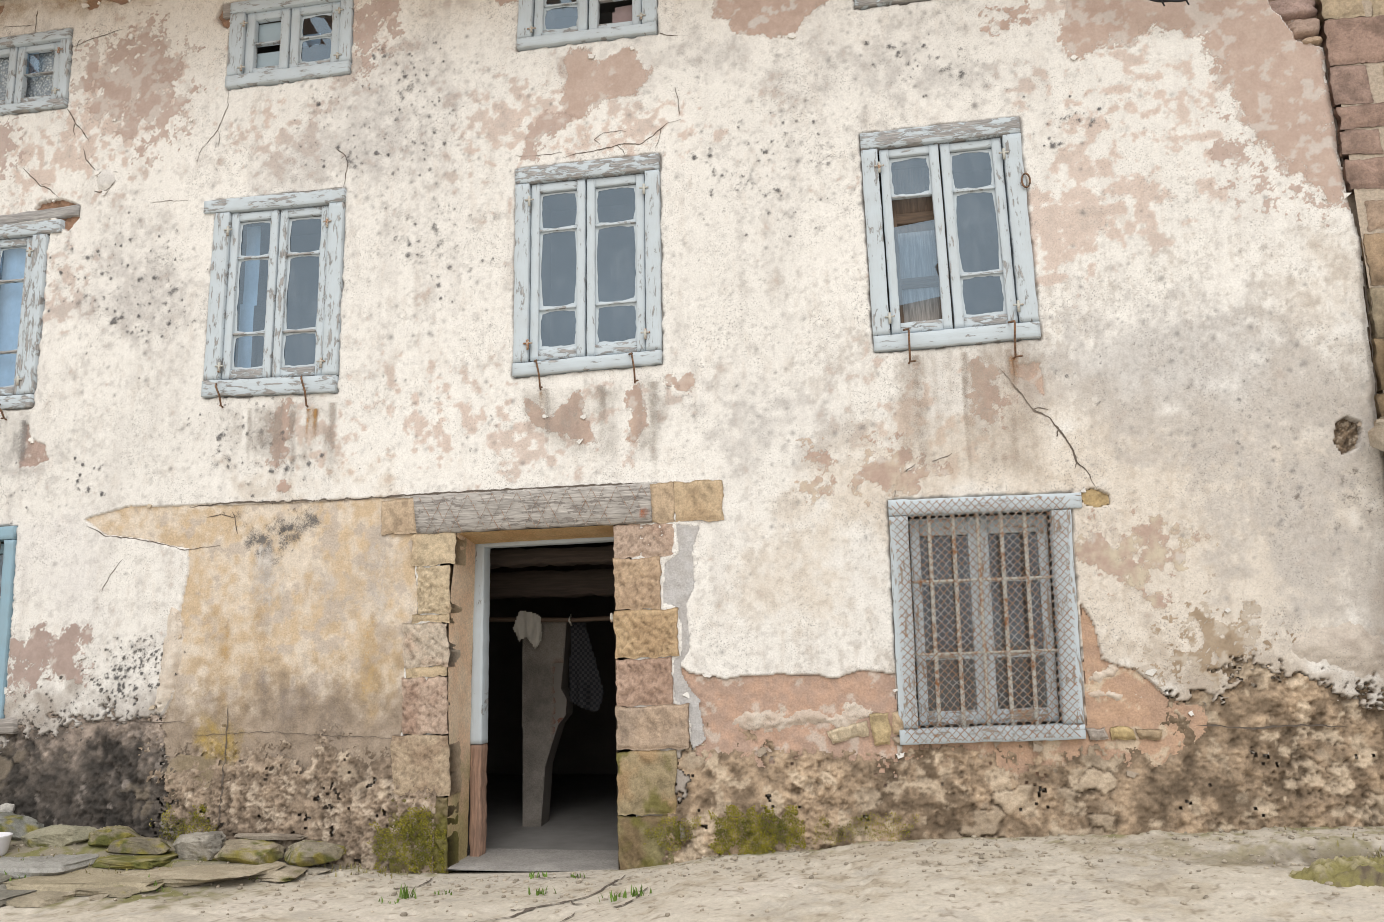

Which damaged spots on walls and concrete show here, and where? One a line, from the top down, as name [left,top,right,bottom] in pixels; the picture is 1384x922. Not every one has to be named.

peeling [352,0,414,87]
peeling [519,46,654,161]
peeling [712,0,828,39]
peeling [1057,0,1351,227]
crack [998,367,1097,489]
damp [3,635,177,749]
peeling [0,397,436,874]
spalling [660,488,1384,865]